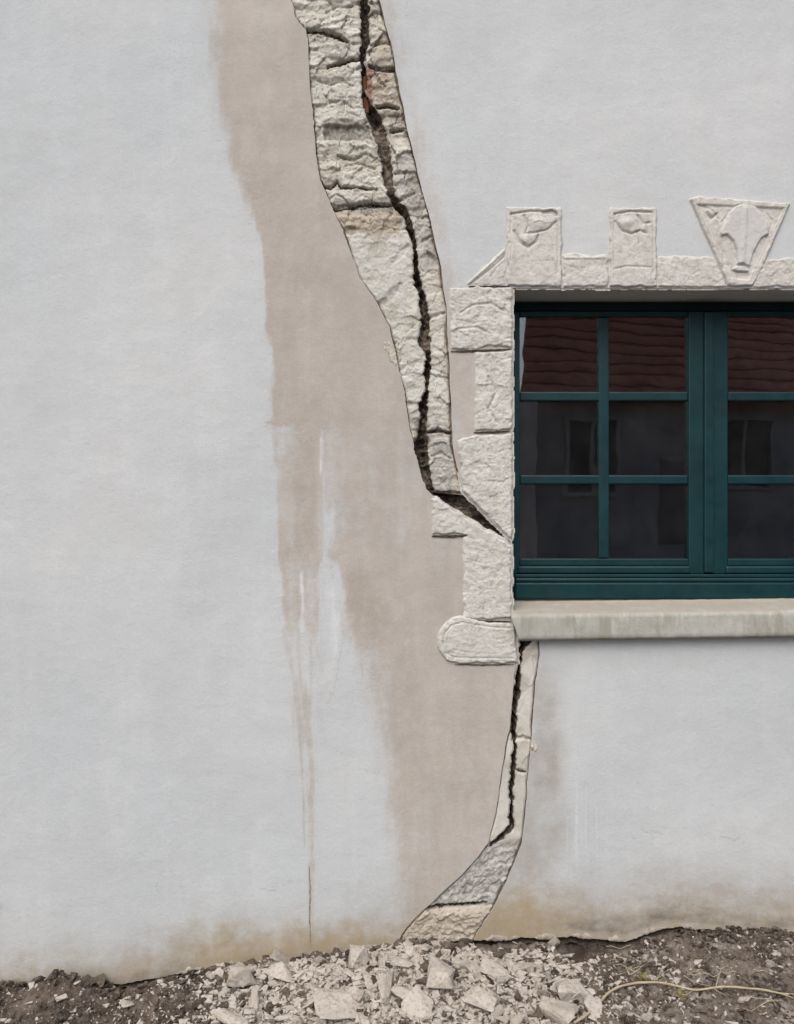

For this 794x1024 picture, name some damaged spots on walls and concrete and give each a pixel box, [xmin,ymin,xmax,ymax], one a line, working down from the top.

leakage [197,0,515,924]
flaking render [291,0,462,495]
crack [294,0,510,542]
flaking render [402,635,539,942]
crack [400,641,699,949]